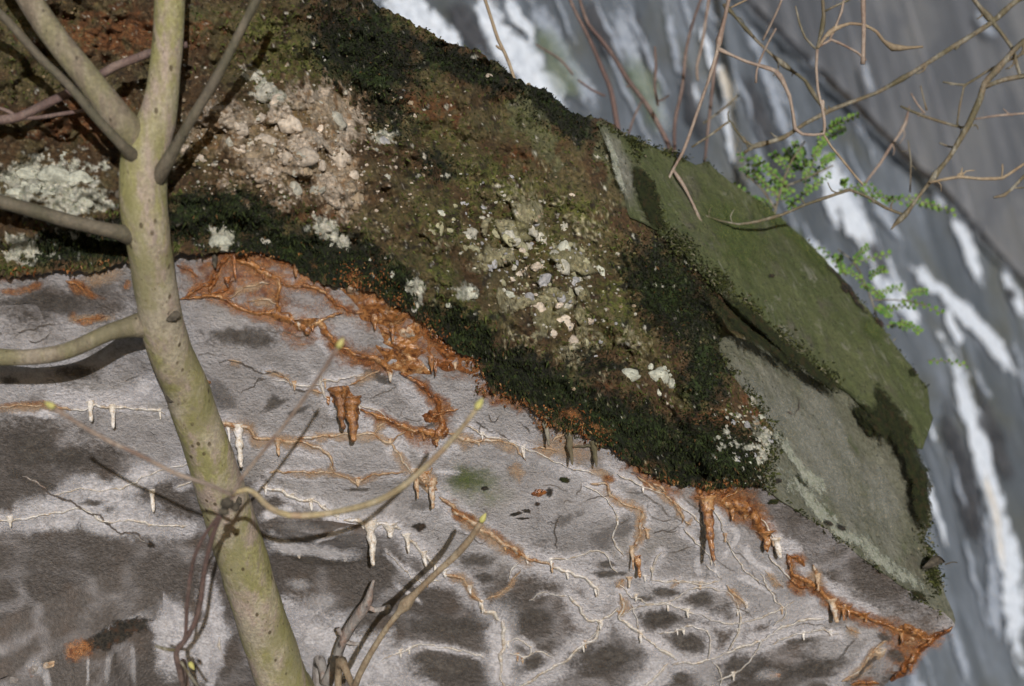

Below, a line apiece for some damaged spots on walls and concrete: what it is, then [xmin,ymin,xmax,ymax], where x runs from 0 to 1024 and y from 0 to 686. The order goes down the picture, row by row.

crack [17,323,59,343]
damp [0,373,165,429]
crack [198,352,307,392]
corrosion [176,248,778,552]
crack [8,470,160,548]
damp [0,436,187,541]
damp [223,403,412,521]
damp [292,425,840,686]
crack [464,395,827,629]
damp [67,589,231,683]
crack [837,640,887,686]
corrosion [786,554,953,682]